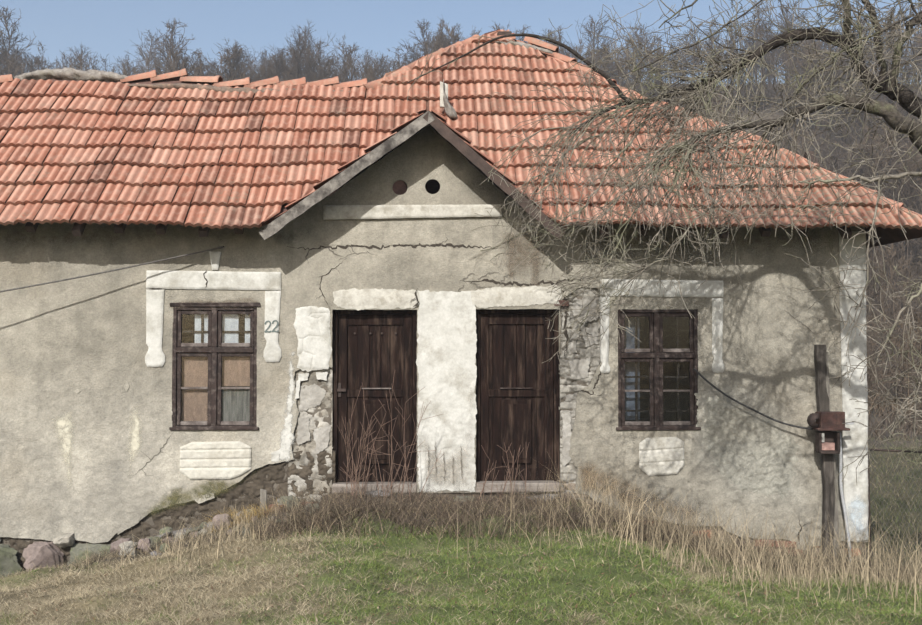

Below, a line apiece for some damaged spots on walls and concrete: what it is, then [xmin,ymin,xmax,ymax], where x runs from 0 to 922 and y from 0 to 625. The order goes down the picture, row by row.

crack [287,234,504,306]
crack [458,272,603,396]
crack [133,434,172,476]
flaking render [56,306,335,565]
flaking render [557,287,821,558]
flaking render [0,537,45,573]